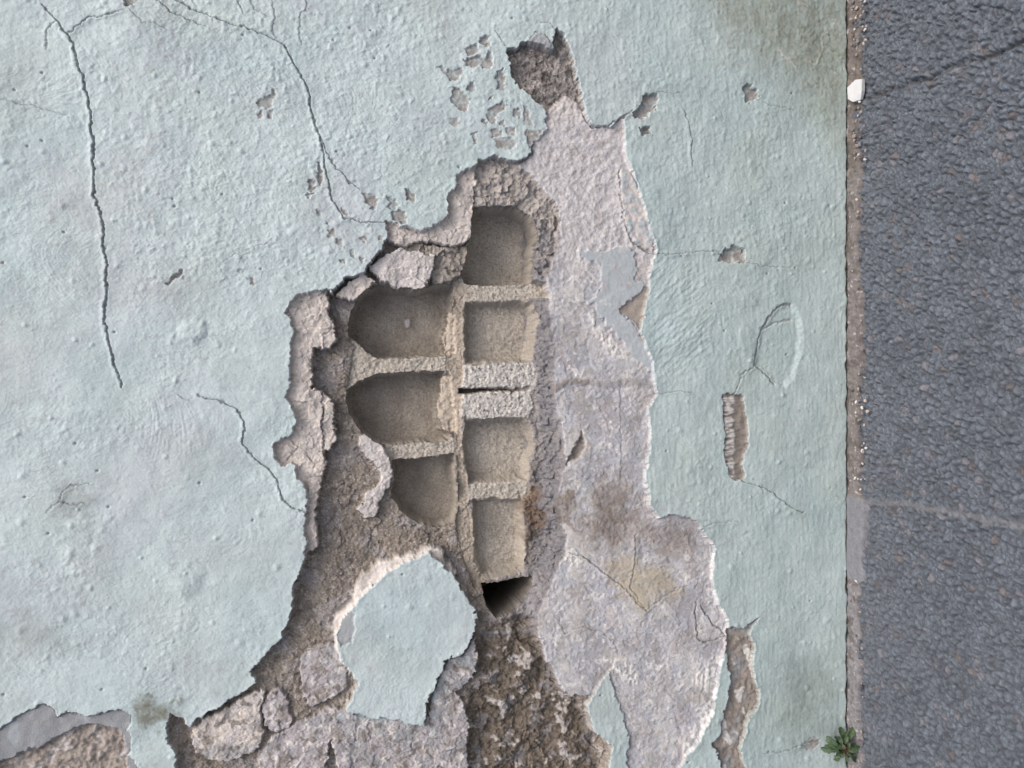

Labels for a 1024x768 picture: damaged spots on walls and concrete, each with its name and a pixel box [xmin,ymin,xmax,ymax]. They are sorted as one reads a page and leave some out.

crack [0,0,386,388]
crack [177,394,307,515]
flaking render [165,28,760,768]
crack [737,478,805,514]